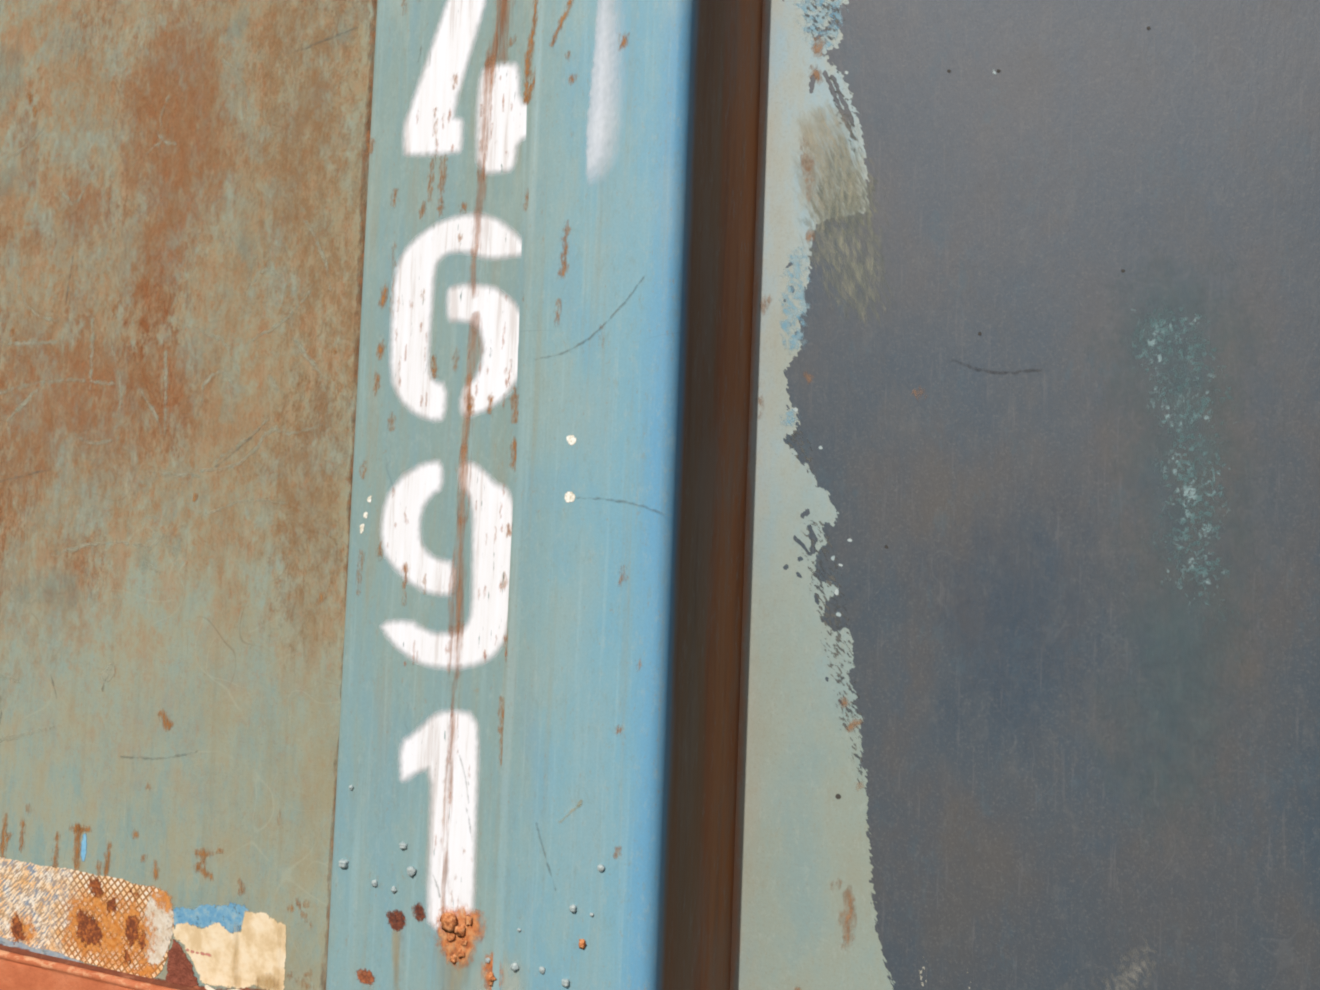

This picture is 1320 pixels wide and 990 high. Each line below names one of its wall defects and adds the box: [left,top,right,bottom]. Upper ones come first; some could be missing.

peeling [802,0,841,46]
rust [363,76,373,179]
peeling [829,71,858,152]
rust [358,205,367,304]
peeling [803,520,863,783]
rust [74,824,90,869]
rust [0,913,35,951]
rust [63,844,262,990]
peeling [173,902,248,933]
rust [386,903,425,931]
rust [438,908,482,963]
rust [483,954,493,990]